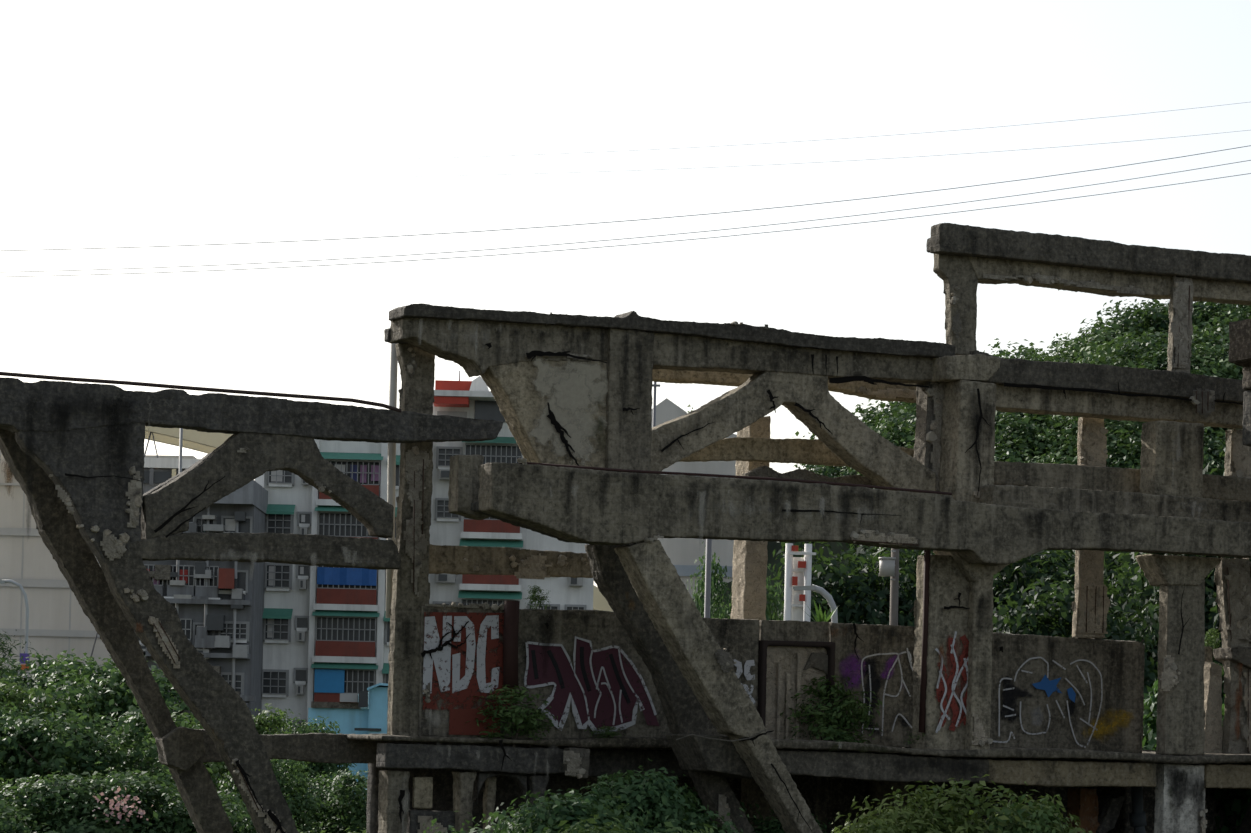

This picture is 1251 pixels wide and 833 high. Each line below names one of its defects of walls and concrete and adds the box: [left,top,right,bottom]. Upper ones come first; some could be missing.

crack [547,402,579,466]
crack [965,382,1243,495]
spalling [49,466,143,561]
spalling [124,588,148,603]
spalling [148,616,180,668]
spalling [1160,655,1181,691]
spalling [231,758,287,833]
crack [739,730,812,831]